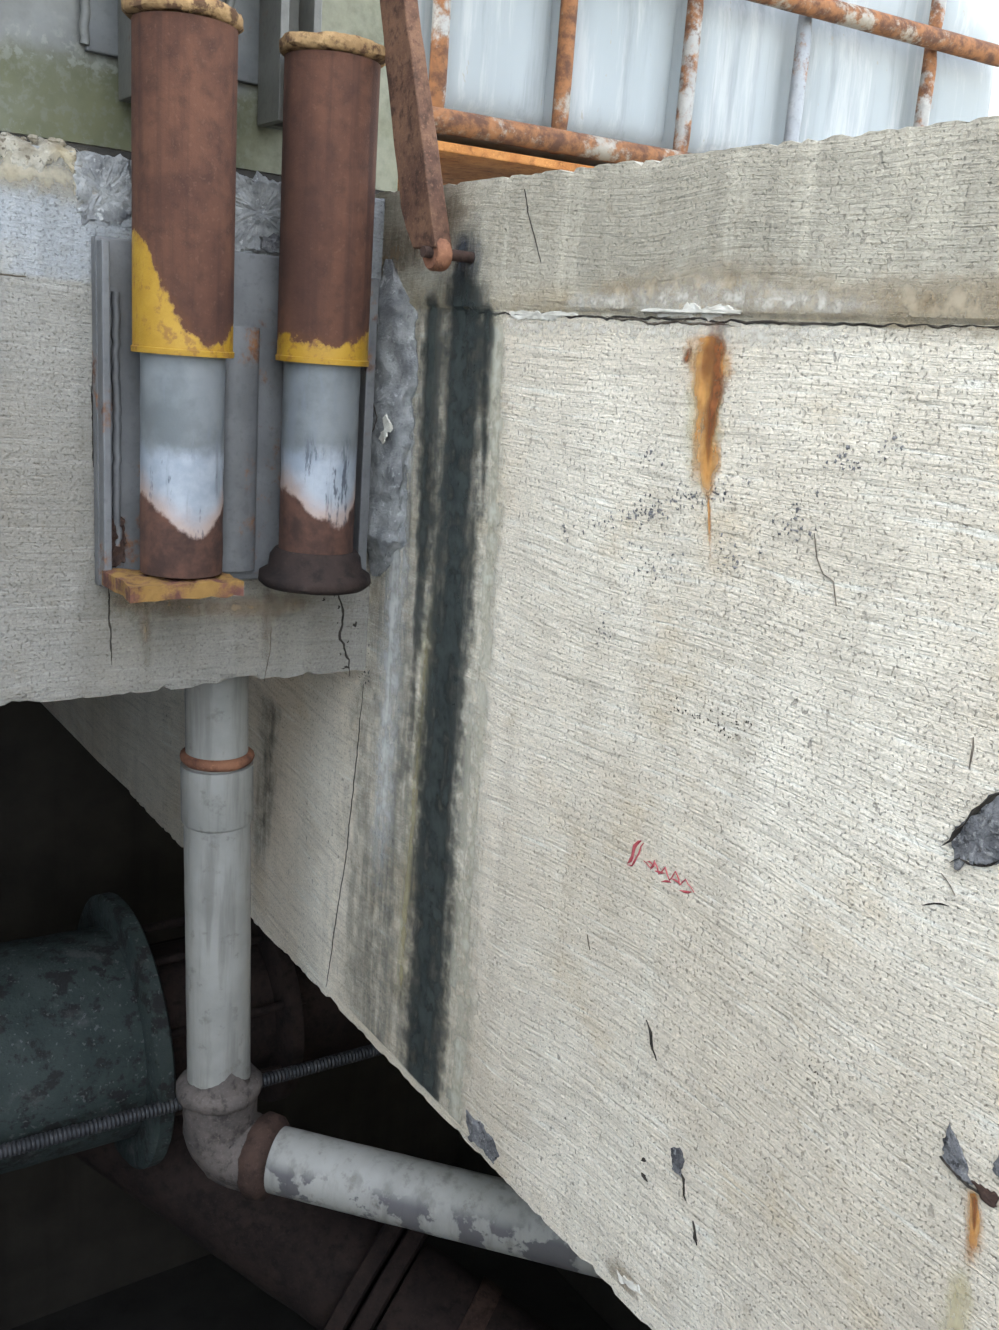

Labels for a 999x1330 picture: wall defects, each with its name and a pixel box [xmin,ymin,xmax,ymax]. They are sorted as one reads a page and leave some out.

crack [482,269,999,339]
rust [684,335,725,536]
damp [354,235,503,1124]
spalling [941,792,999,871]
spalling [466,1110,499,1164]
spalling [939,1123,999,1208]
rust [968,1193,980,1252]